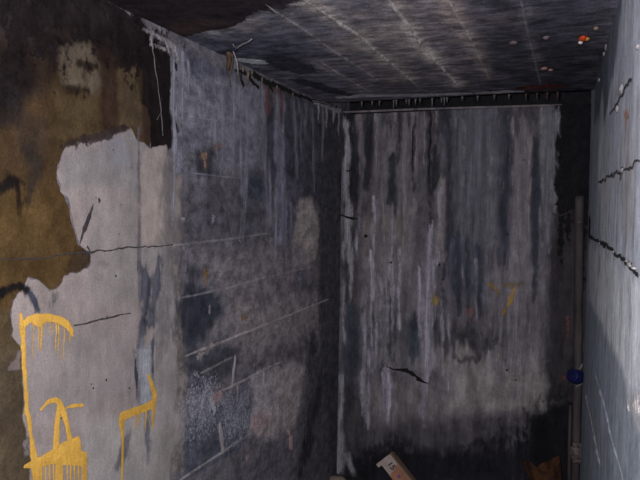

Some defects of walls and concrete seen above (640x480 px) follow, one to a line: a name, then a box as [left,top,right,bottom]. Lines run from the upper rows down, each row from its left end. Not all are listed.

crack [609,78,631,115]
crack [598,159,639,184]
crack [0,198,173,264]
water stain [0,0,190,480]
crack [588,215,638,277]
peeling [8,128,185,480]
crack [74,313,131,326]
water stain [313,100,573,480]
crack [388,367,429,384]